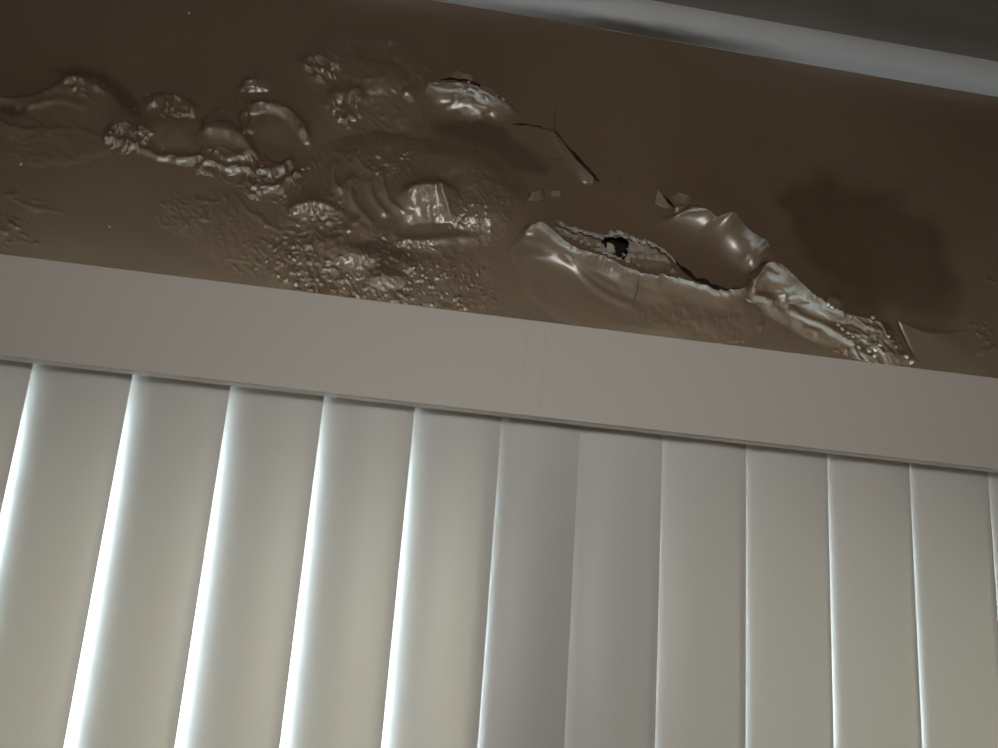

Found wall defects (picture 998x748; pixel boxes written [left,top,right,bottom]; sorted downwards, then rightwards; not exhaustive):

crack [514,107,622,188]
peeling [553,207,771,291]